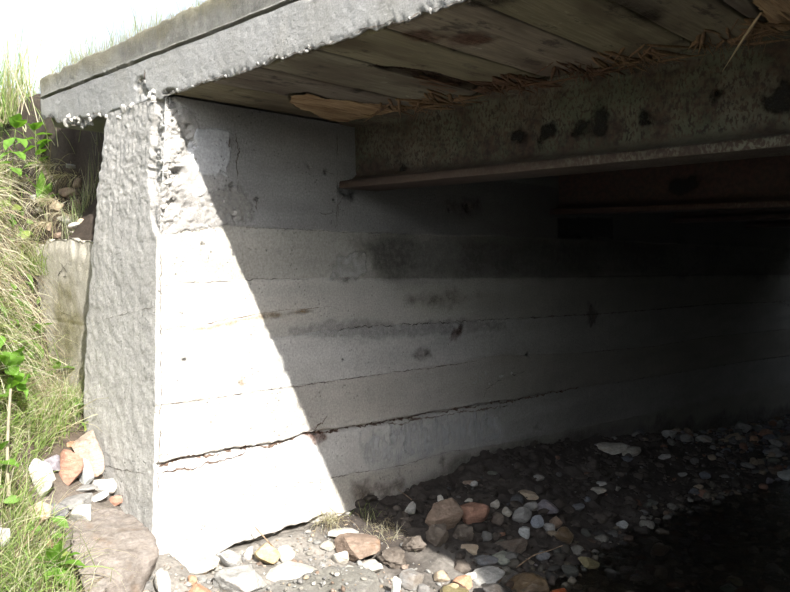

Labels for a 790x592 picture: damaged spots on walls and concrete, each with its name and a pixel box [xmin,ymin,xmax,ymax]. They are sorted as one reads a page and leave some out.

spalling [44,0,462,235]
crack [164,134,382,234]
crack [108,253,578,508]